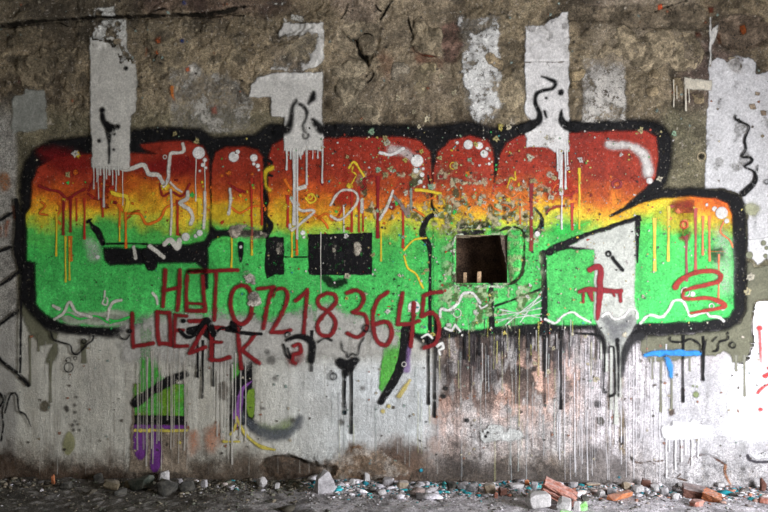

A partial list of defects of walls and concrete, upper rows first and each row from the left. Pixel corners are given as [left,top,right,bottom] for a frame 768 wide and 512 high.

crack [0,6,247,29]
crack [341,1,393,83]
peeling [359,177,394,221]
spalling [393,171,556,327]
damp [0,454,122,480]
damp [373,439,635,483]